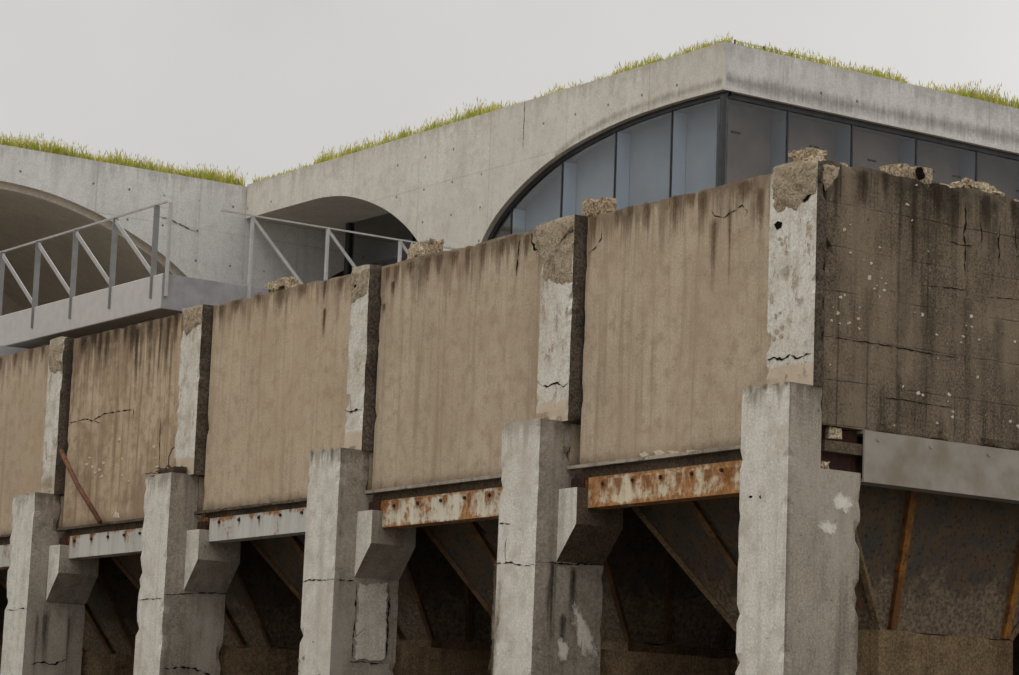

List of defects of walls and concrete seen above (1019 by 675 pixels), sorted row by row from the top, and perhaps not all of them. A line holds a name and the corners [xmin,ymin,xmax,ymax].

spalling [772,161,840,246]
leakage [426,243,485,272]
spalling [533,217,574,286]
leakage [81,313,178,363]
crack [767,335,958,360]
crack [71,410,134,423]
corrosion [585,475,649,491]
corrosion [661,467,736,484]
crack [160,666,210,675]